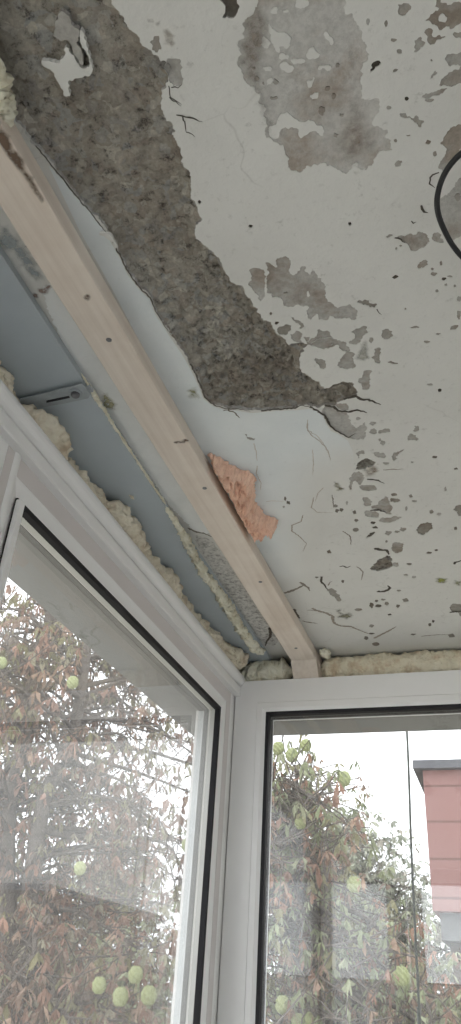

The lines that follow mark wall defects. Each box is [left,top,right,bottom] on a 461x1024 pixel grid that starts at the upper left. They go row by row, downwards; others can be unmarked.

crack [168,85,202,137]
crack [36,146,172,336]
spalling [0,0,461,578]
crack [190,364,404,592]
crack [284,582,395,646]